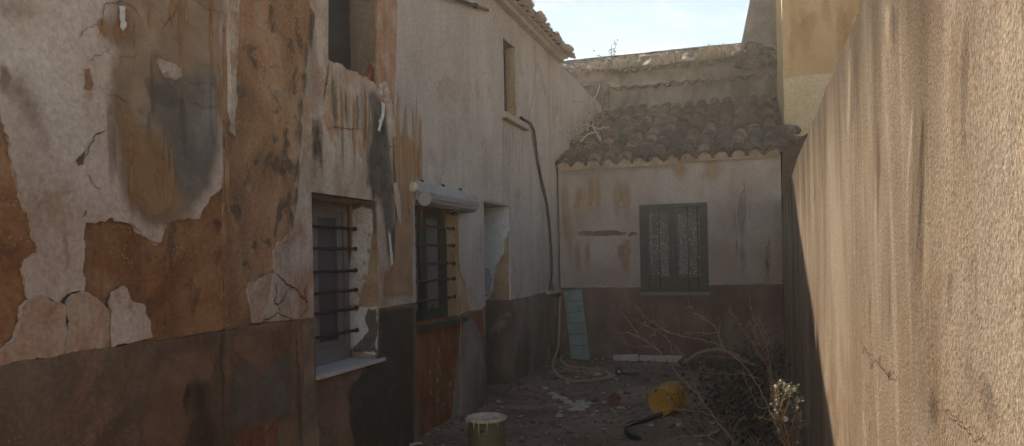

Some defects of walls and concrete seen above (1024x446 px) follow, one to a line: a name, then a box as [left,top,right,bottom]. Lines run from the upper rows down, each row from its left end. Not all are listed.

crack [83,130,107,217]
spalling [0,0,313,446]
leakage [98,0,230,220]
crack [257,273,309,431]
peeling [349,201,378,355]
leakage [332,81,422,255]
spalling [393,181,401,223]
crack [938,401,996,446]